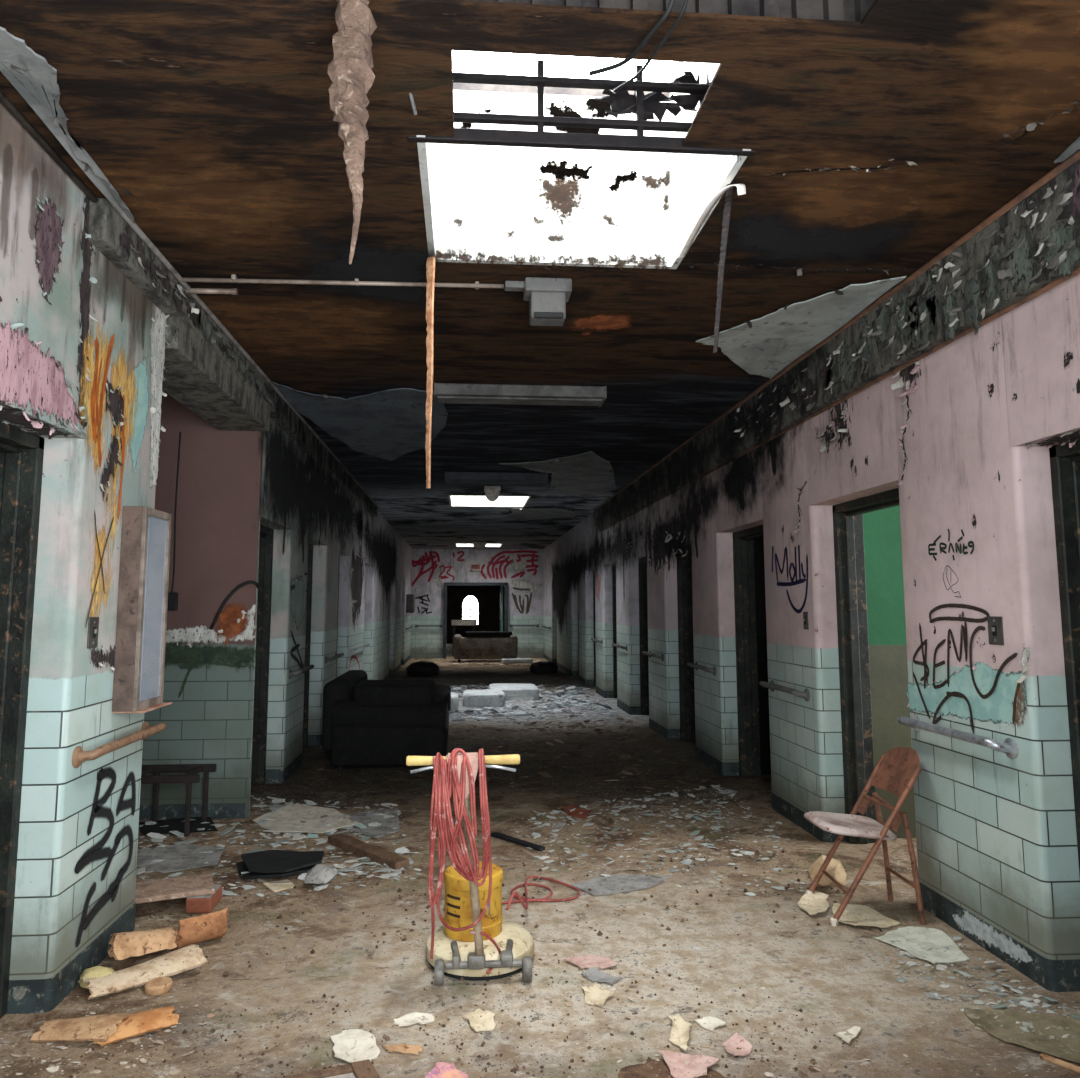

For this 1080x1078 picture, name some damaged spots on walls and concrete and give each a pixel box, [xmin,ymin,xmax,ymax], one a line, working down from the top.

flaking render [0,27,448,503]
peeling [696,137,1080,477]
peeling [907,646,1032,727]